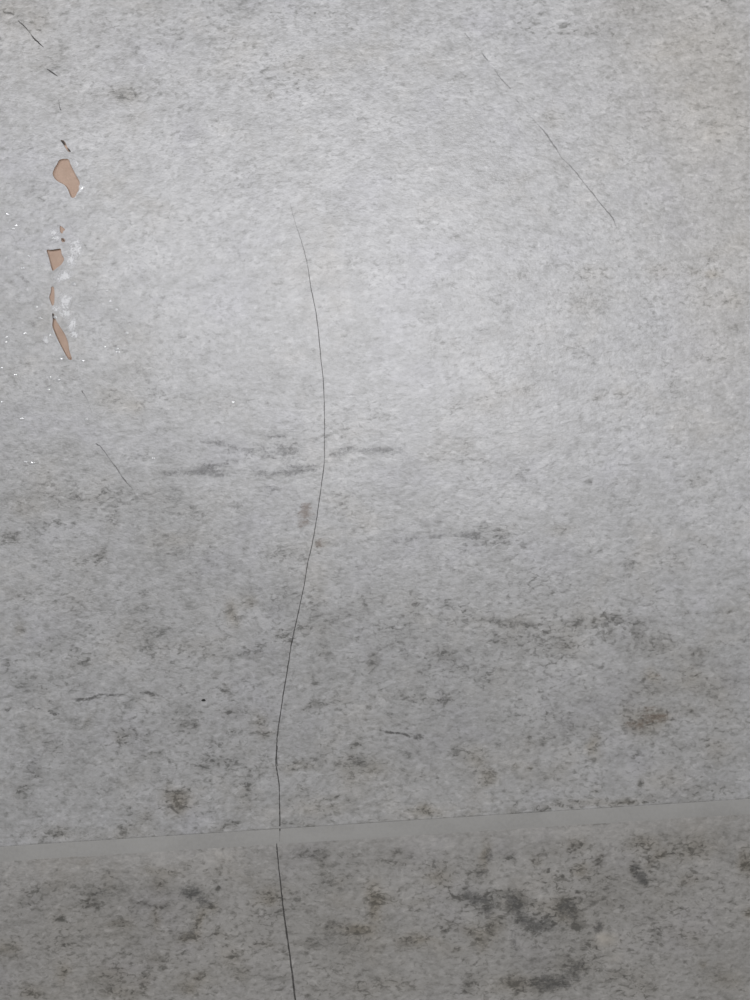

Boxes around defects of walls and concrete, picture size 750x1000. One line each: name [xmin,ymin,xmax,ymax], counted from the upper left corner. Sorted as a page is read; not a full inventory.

spalling [51,140,84,199]
spalling [43,226,82,360]
crack [275,282,325,1000]